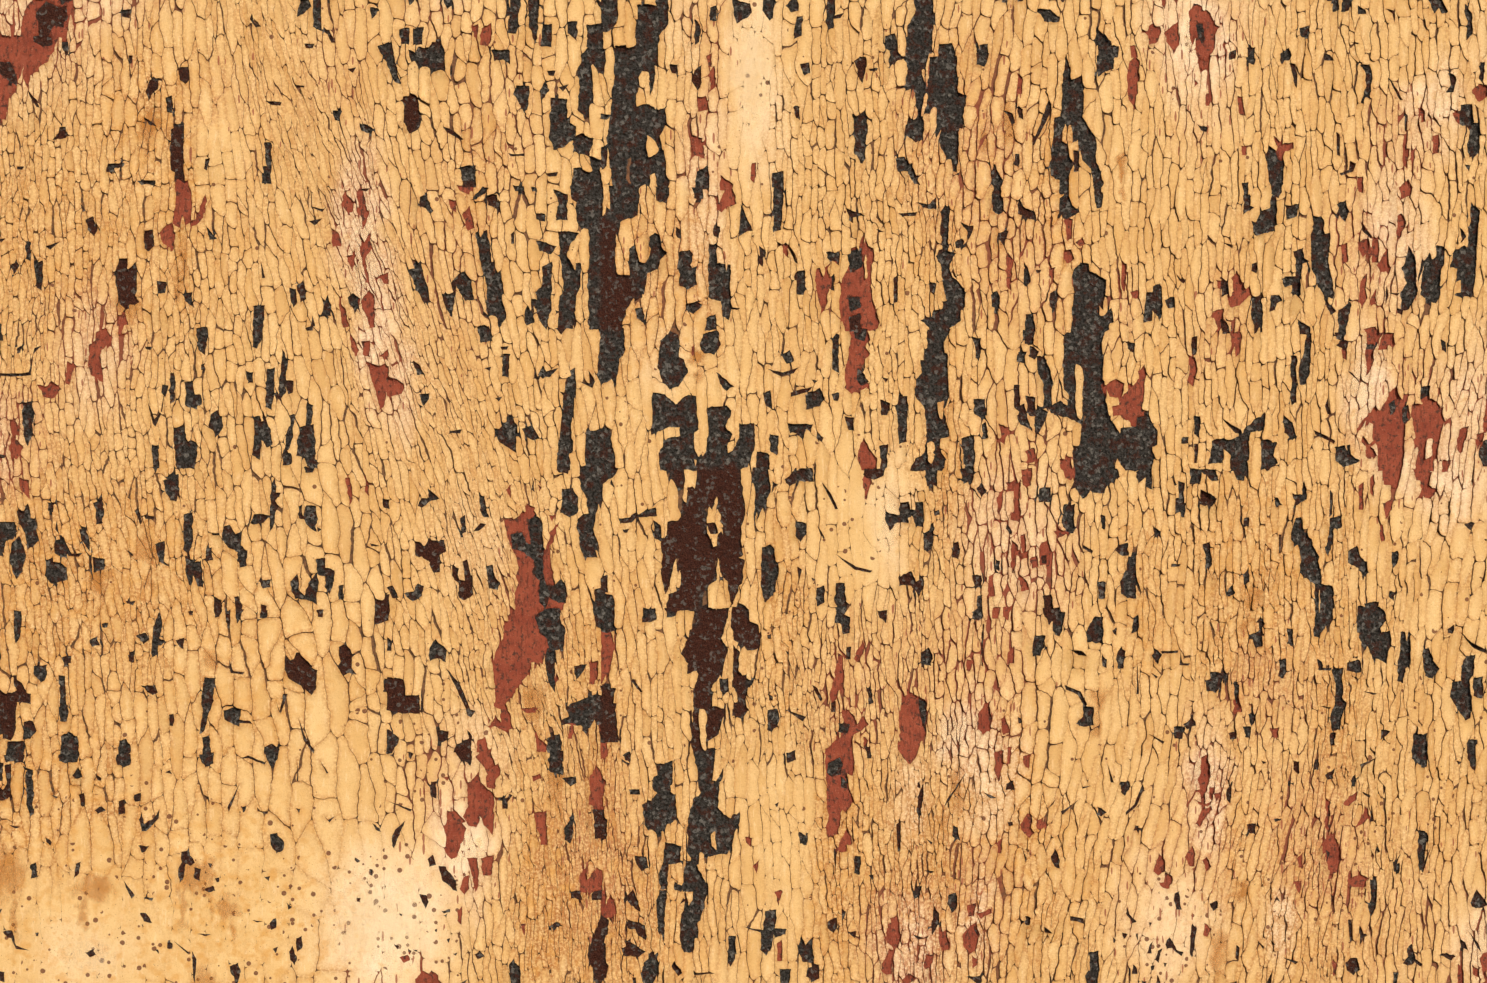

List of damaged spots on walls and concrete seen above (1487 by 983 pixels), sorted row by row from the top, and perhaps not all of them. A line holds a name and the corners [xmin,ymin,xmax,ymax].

peeling [0,0,133,123]
crack [1004,91,1051,145]
peeling [1395,0,1487,40]
peeling [0,75,492,762]
crack [769,367,817,397]
peeling [368,0,1256,983]
crack [797,483,872,582]
crack [446,669,470,709]
crack [1065,650,1086,706]
peeling [192,647,300,881]
crack [203,694,328,814]
peeling [1288,759,1382,934]